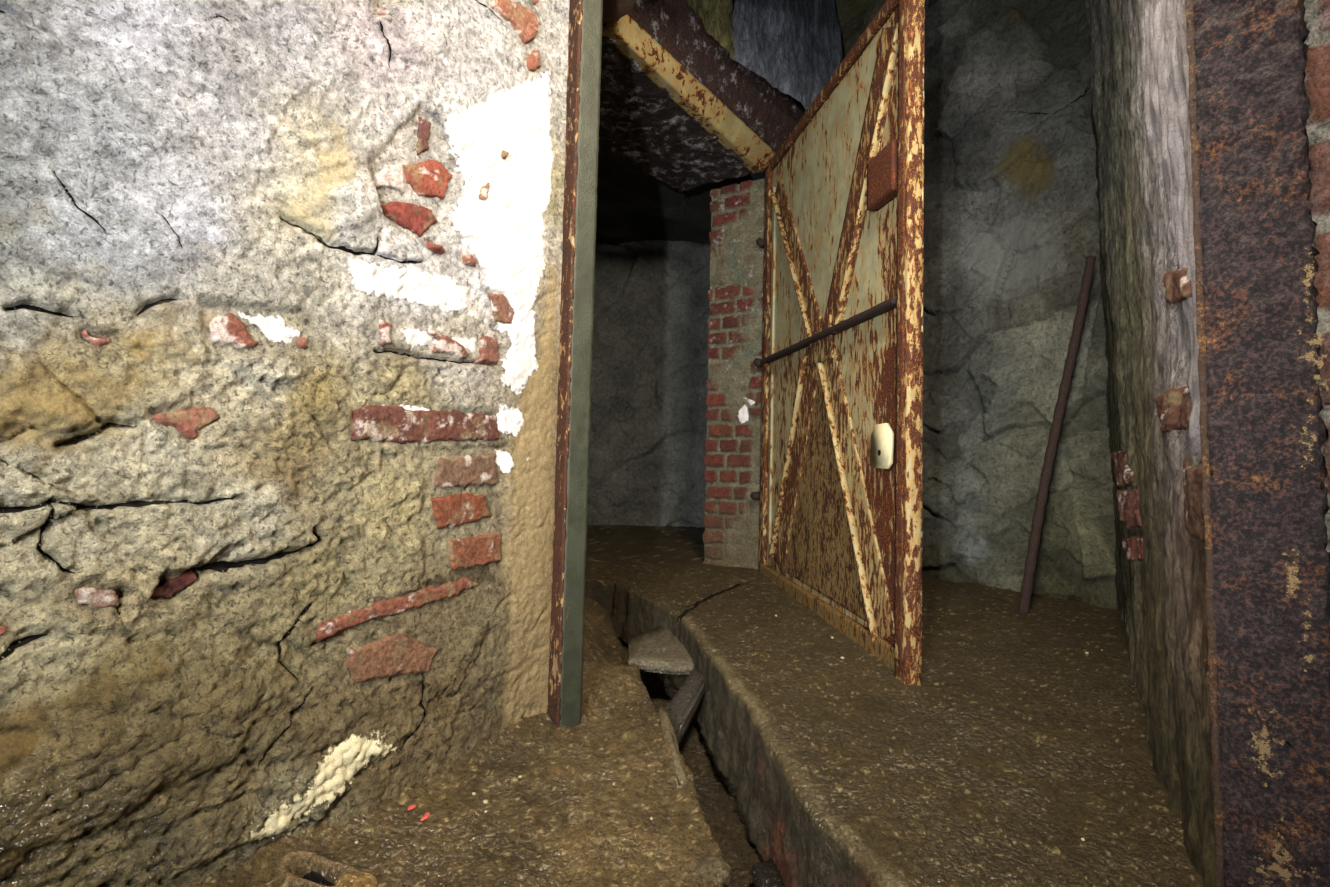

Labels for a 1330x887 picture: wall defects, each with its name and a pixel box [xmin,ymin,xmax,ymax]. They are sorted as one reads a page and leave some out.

crack [53,171,106,231]
crack [4,304,73,317]
crack [137,298,177,315]
flaking render [186,292,326,367]
peeling [295,0,558,727]
crack [55,423,132,446]
flaking render [136,393,234,451]
crack [0,495,238,574]
crack [193,531,320,572]